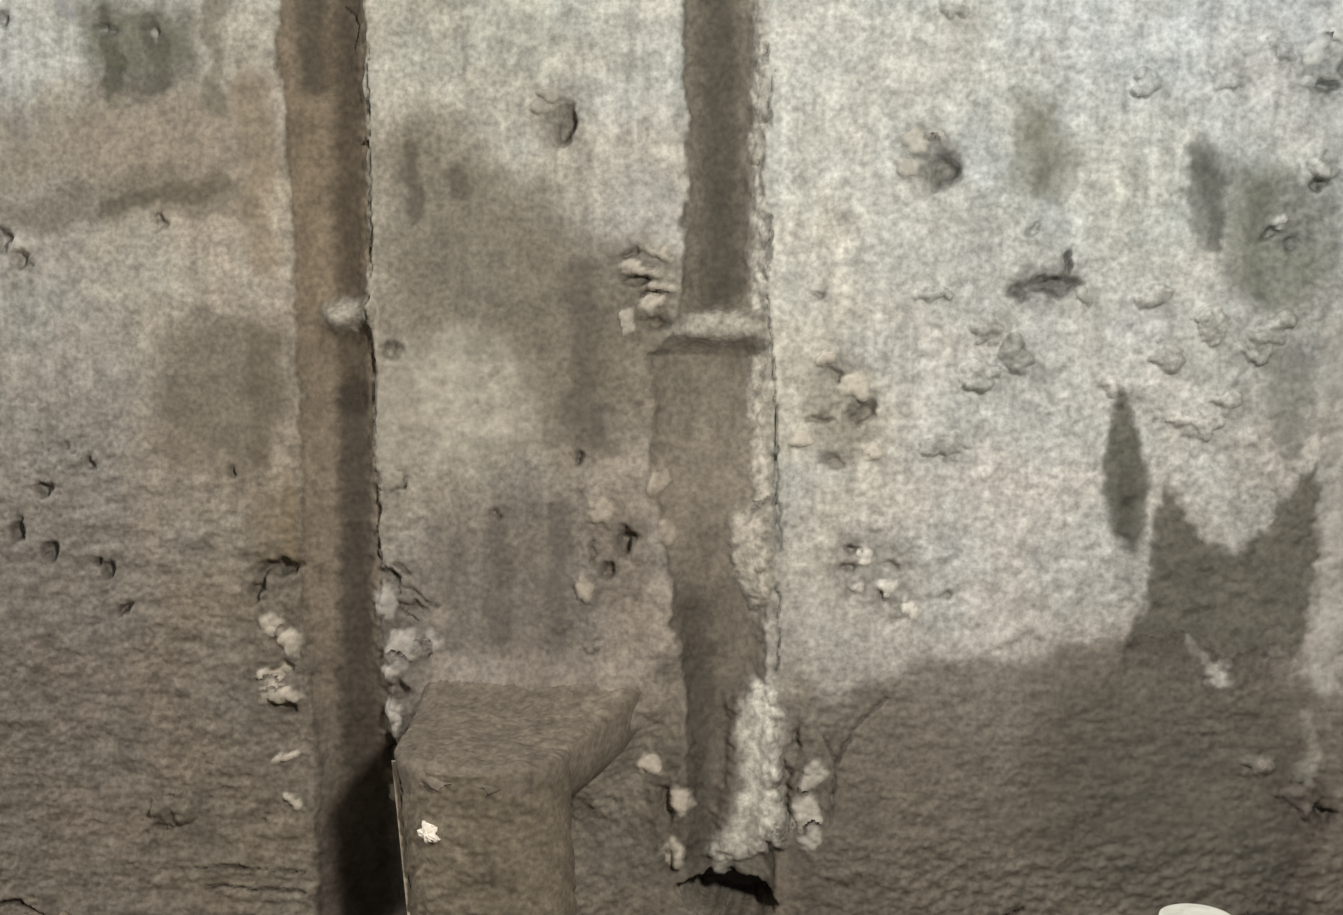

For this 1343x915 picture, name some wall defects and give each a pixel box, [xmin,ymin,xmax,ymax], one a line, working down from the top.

flaking render [619,243,678,336]
flaking render [251,557,299,599]
flaking render [256,613,304,711]
flaking render [374,570,443,763]
leakage [797,393,1343,915]
flaking render [271,751,301,764]
flaking render [283,793,302,810]
flaking render [766,726,828,851]